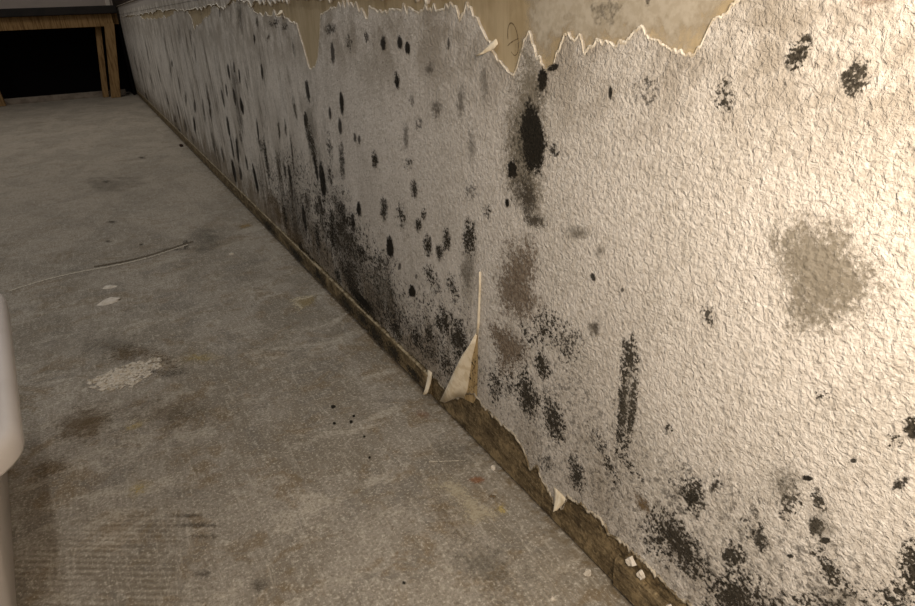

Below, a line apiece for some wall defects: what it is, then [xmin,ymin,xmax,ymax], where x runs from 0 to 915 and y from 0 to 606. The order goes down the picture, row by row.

water stain [134,58,212,139]
peeling [121,0,742,76]
water stain [714,77,733,117]
water stain [785,33,813,71]
water stain [841,60,872,97]
water stain [221,0,721,441]
water stain [766,214,889,333]
peeling [412,272,693,606]
water stain [590,333,644,487]
water stain [887,416,915,447]
water stain [635,472,915,606]